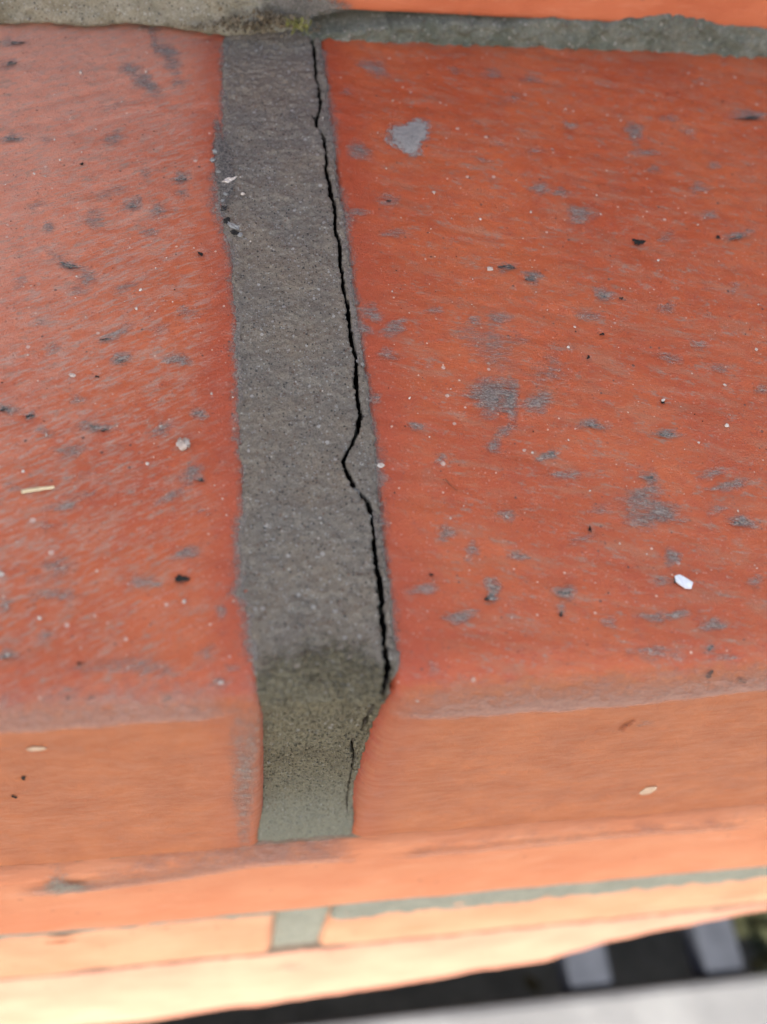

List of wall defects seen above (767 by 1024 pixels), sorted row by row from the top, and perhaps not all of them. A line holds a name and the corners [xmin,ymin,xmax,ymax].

crack [306,47,391,768]